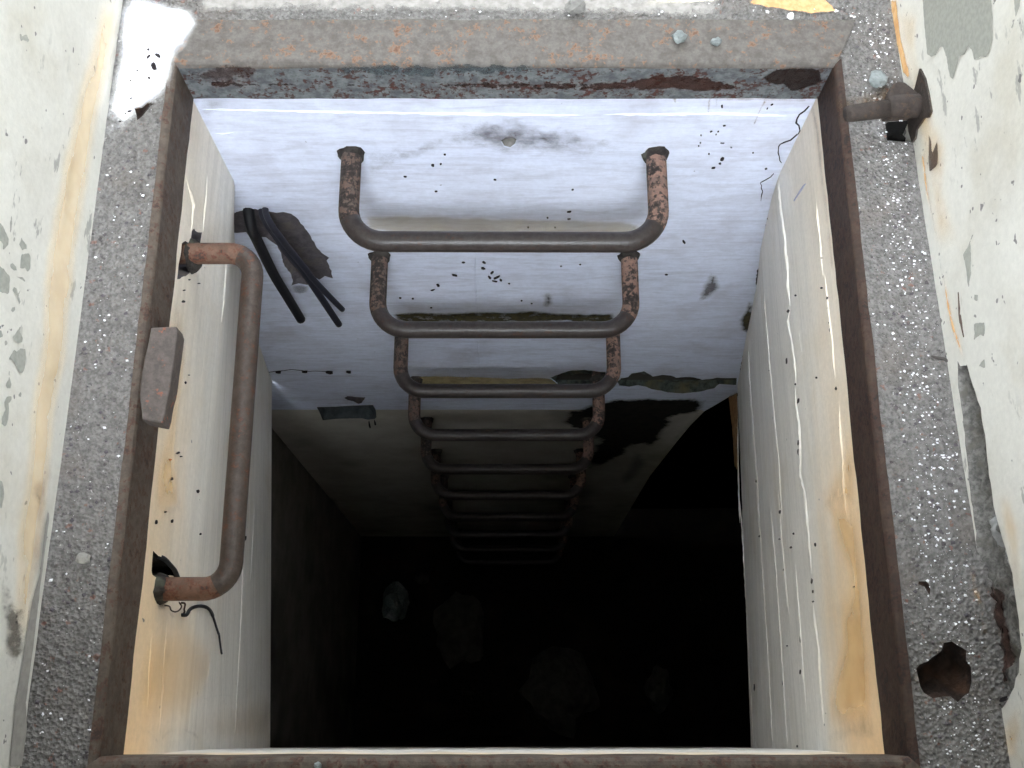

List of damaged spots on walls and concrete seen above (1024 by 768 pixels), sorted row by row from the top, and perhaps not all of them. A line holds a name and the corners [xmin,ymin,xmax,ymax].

peeling [923,0,992,78]
rust [206,67,256,87]
rust [342,64,735,92]
peeling [0,217,31,312]
peeling [963,235,978,301]
peeling [974,323,985,339]
peeling [0,327,26,426]
spalling [618,371,737,393]
spalling [916,642,972,702]